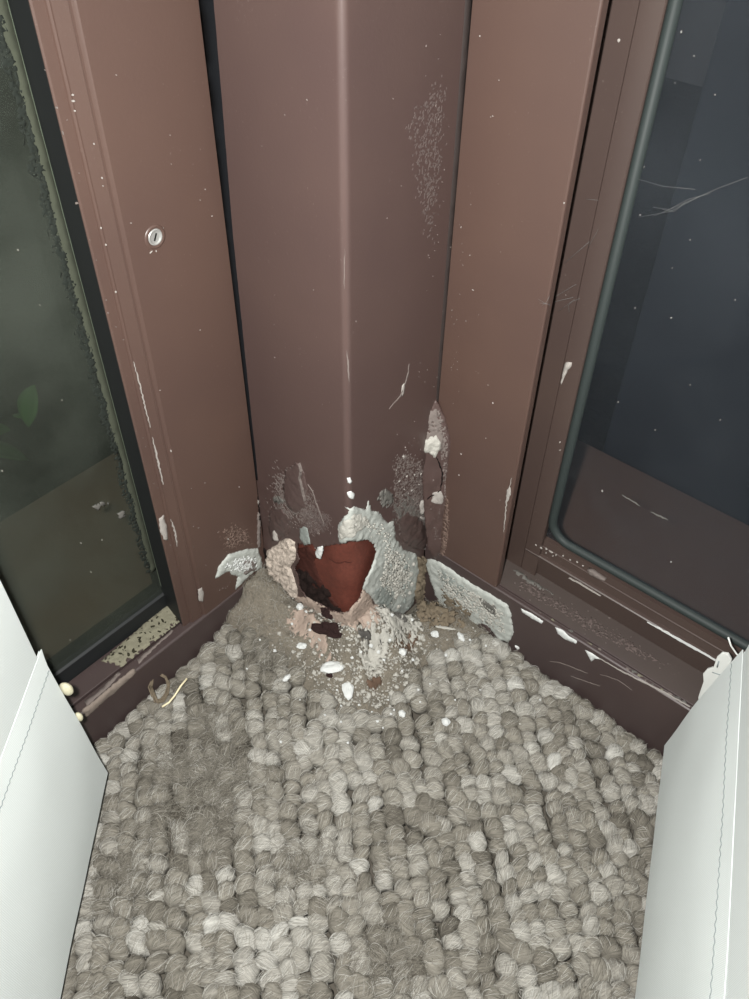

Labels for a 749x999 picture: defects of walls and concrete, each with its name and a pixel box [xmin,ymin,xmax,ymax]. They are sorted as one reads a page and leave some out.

crack [427,457,443,500]
peeling [159,515,168,540]
peeling [215,503,279,590]
peeling [299,526,324,559]
peeling [338,478,543,649]